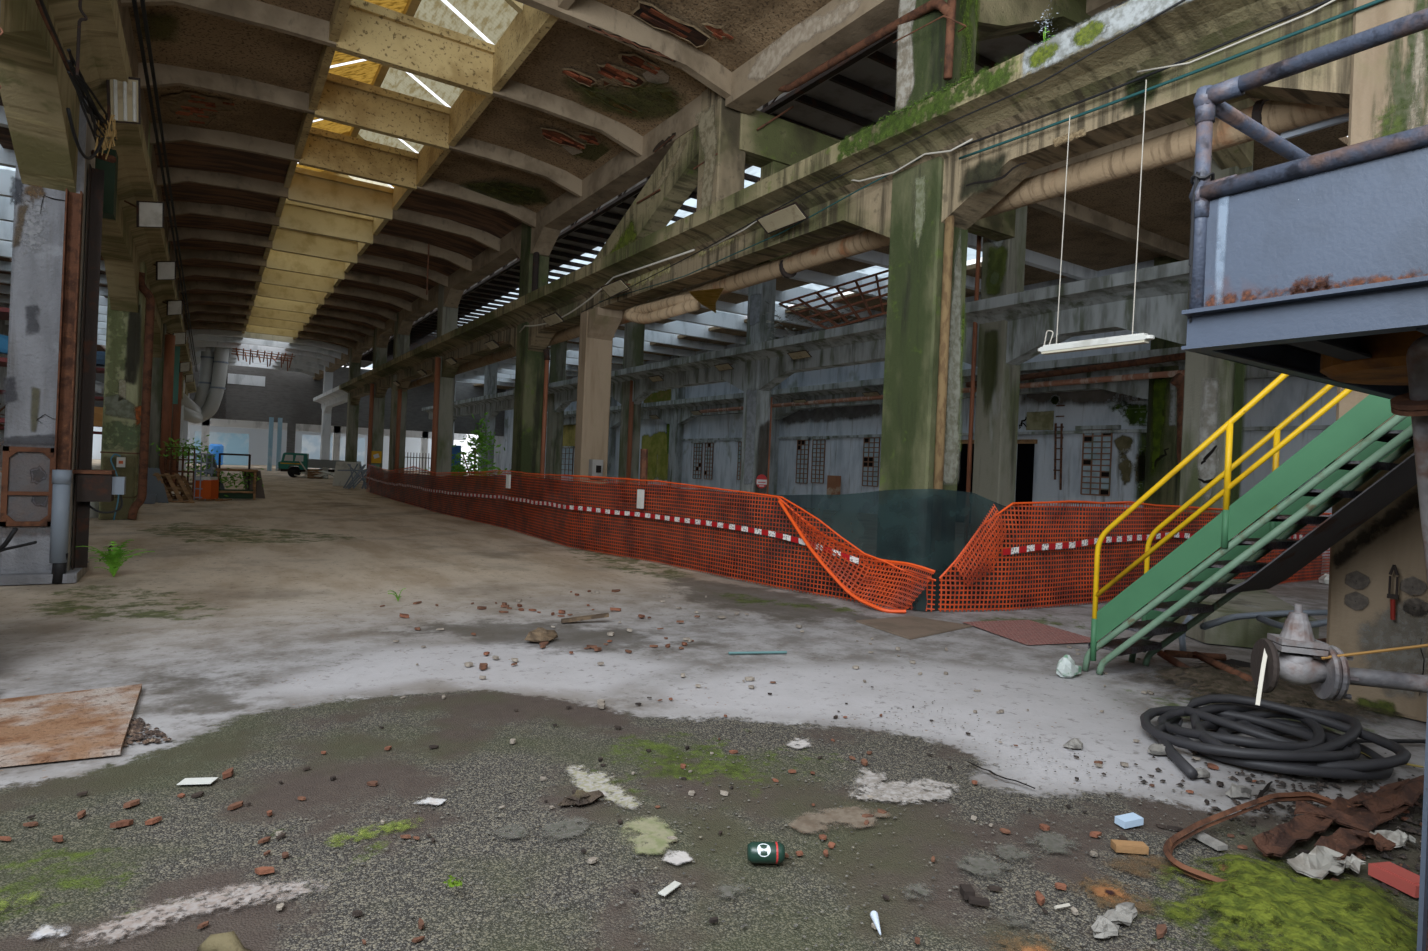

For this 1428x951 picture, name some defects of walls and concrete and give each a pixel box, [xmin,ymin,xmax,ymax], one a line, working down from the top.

corrosion [1205,272,1428,307]